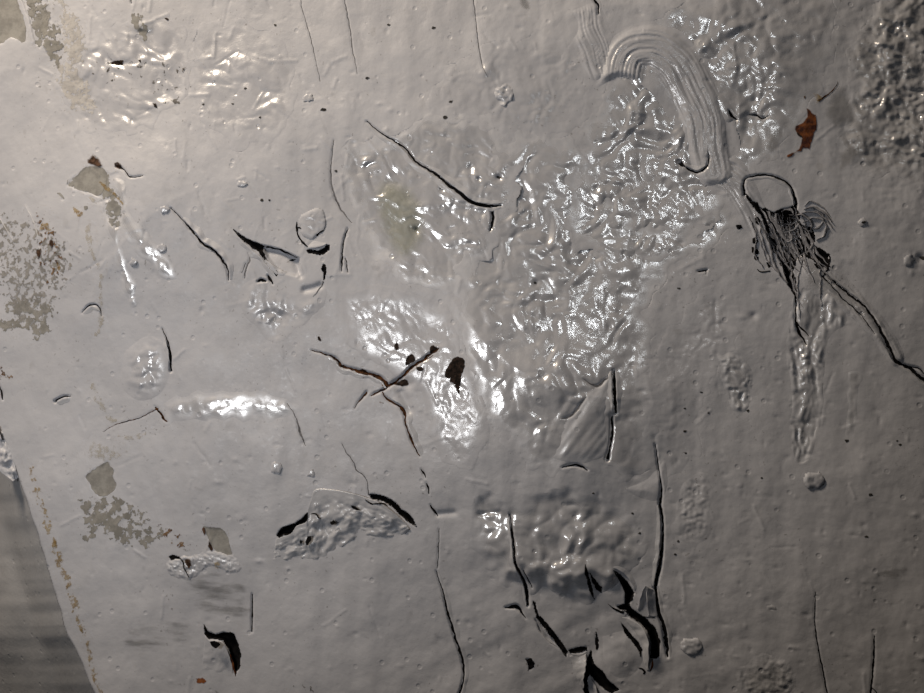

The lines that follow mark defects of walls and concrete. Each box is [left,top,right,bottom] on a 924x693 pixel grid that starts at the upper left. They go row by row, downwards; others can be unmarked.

spalling [0,0,64,69]
crack [365,121,501,231]
crack [743,174,797,207]
corrosion [787,96,817,157]
peeling [0,213,77,341]
crack [757,254,924,389]
crack [311,348,439,516]
peeling [78,462,242,580]
crack [436,542,469,693]
crack [505,514,532,618]
crack [611,446,673,657]